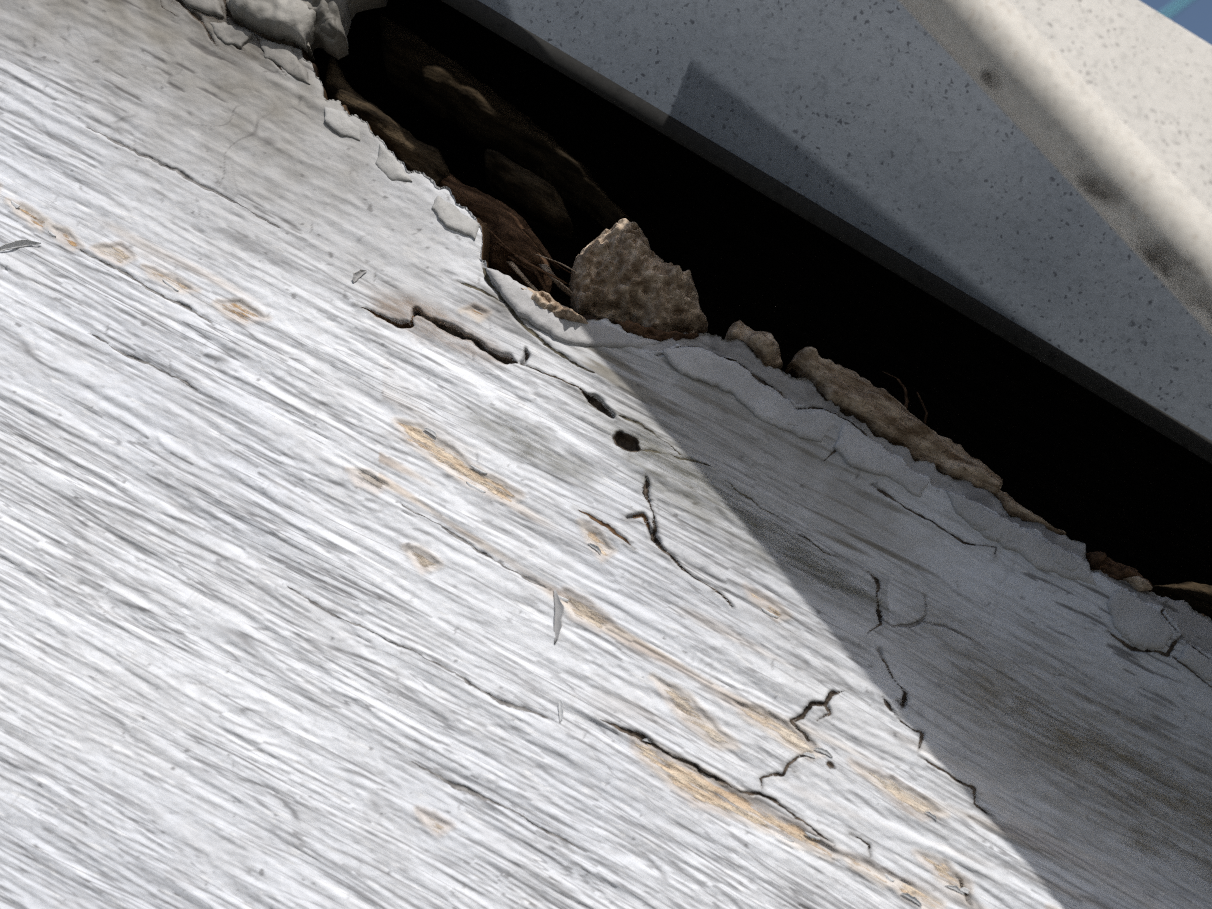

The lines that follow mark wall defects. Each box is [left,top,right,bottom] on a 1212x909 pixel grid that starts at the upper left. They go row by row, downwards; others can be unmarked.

peeling [182,0,310,84]
peeling [375,144,412,182]
peeling [399,423,514,502]
crack [362,268,773,604]
hole [613,432,641,452]
peeling [663,346,931,497]
crack [877,488,997,552]
peeling [554,590,608,644]
crack [869,575,970,638]
peeling [1106,588,1172,651]
crack [601,691,871,849]
crack [882,659,988,814]